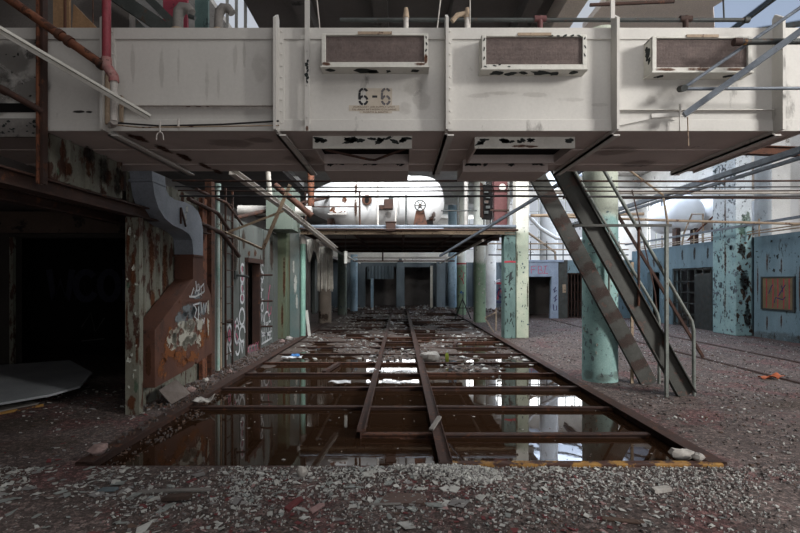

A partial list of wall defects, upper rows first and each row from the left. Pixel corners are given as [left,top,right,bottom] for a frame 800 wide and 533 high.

peeling [483,38,559,76]
peeling [342,136,412,144]
peeling [713,232,759,333]
rust [136,319,210,379]